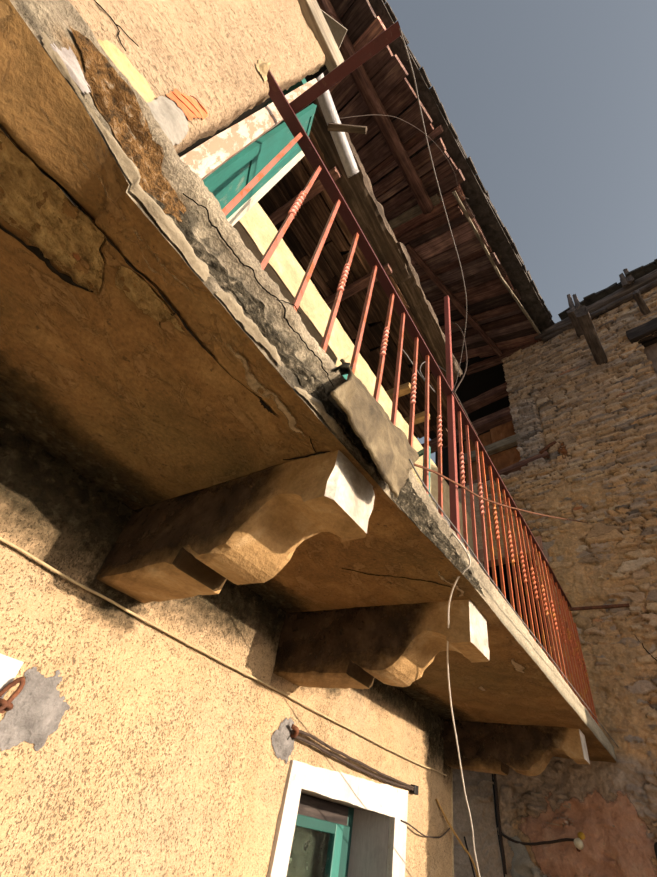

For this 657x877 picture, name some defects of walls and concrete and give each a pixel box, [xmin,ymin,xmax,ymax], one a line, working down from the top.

crack [94,0,139,51]
spalling [0,132,105,294]
crack [0,126,261,398]
spalling [41,26,380,480]
crack [183,193,334,387]
water stain [230,347,305,437]
water stain [0,361,276,629]
water stain [152,579,565,781]
peeling [518,788,657,877]